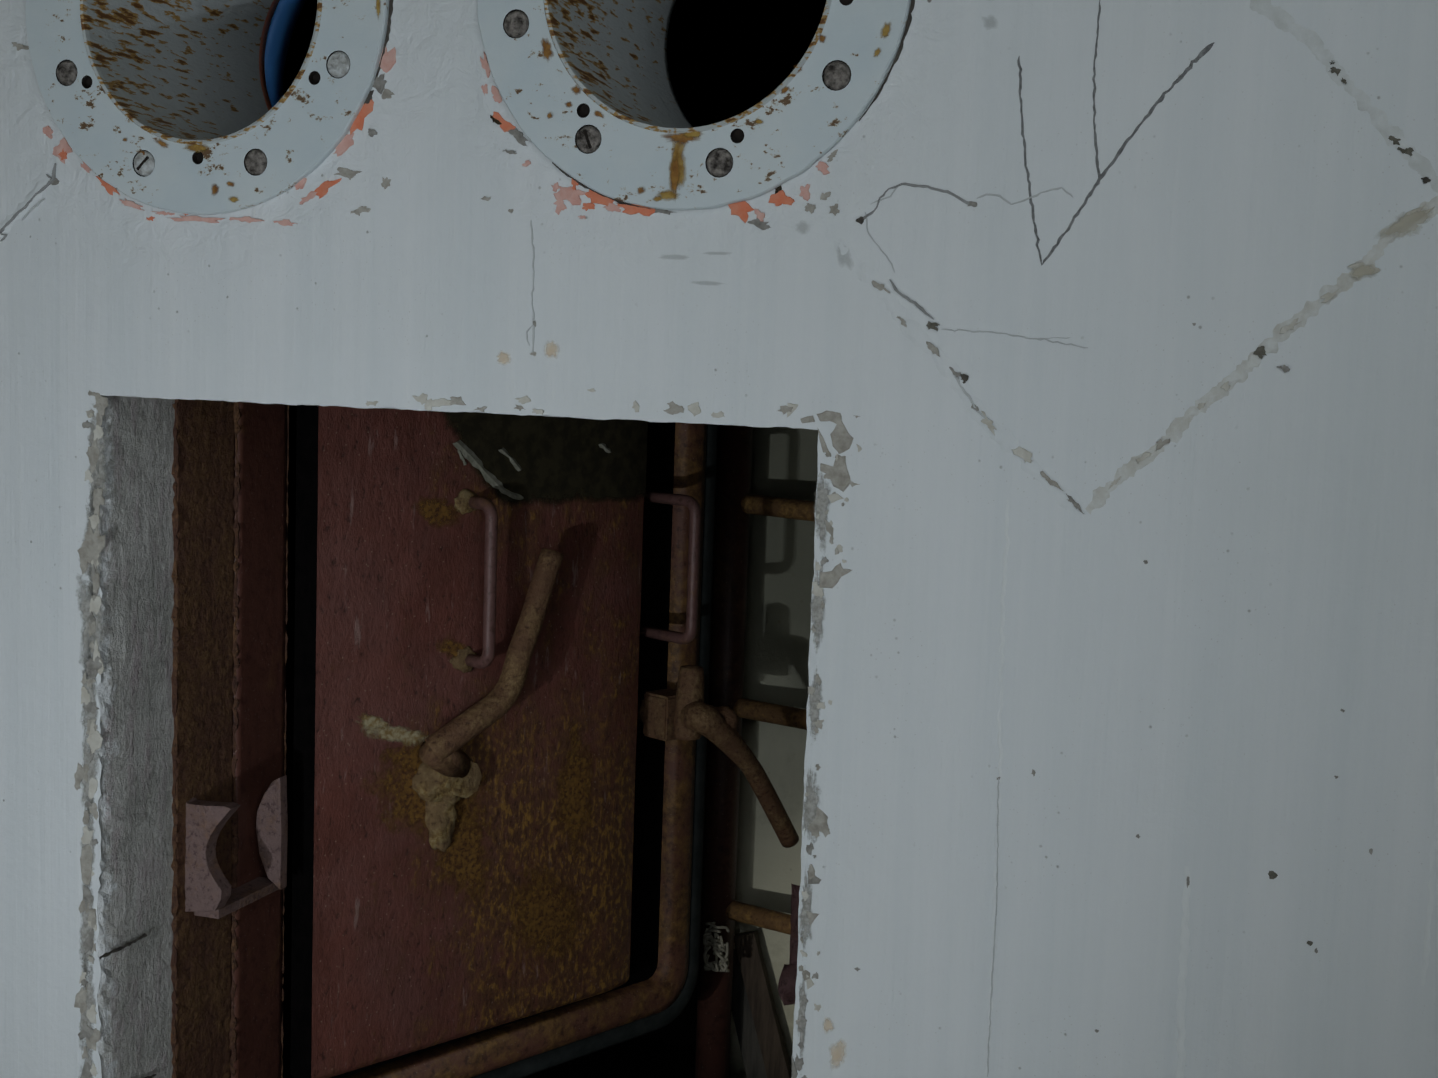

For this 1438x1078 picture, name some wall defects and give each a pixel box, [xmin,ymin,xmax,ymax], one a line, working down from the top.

corrosion [542,39,552,59]
crack [859,0,915,121]
crack [0,163,59,242]
corrosion [212,182,238,202]
peeling [295,47,396,205]
corrosion [638,131,700,201]
peeling [728,149,840,230]
crack [856,183,1073,272]
crack [941,329,1088,348]
spalling [778,403,862,647]
spalling [74,390,109,1078]
spalling [792,764,830,1078]